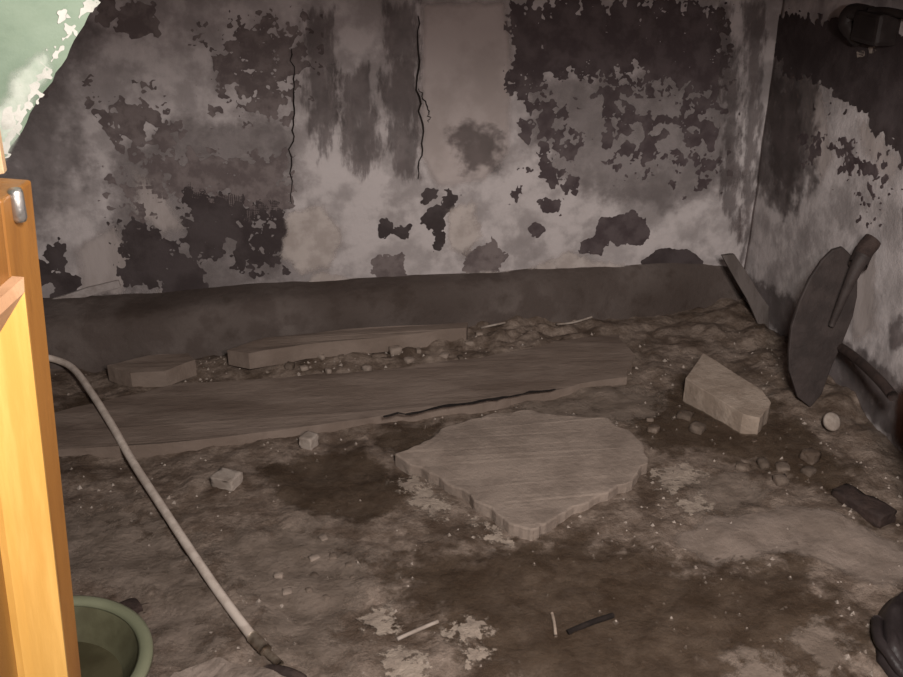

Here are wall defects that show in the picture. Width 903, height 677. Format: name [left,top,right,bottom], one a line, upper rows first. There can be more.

peeling [0,0,161,158]
peeling [188,8,324,129]
peeling [501,0,740,216]
damp [757,43,831,215]
damp [861,123,898,179]
peeling [82,74,297,293]
peeling [39,237,82,298]
peeling [370,252,408,277]
peeling [378,188,462,252]
peeling [461,236,509,273]
peeling [528,222,546,238]